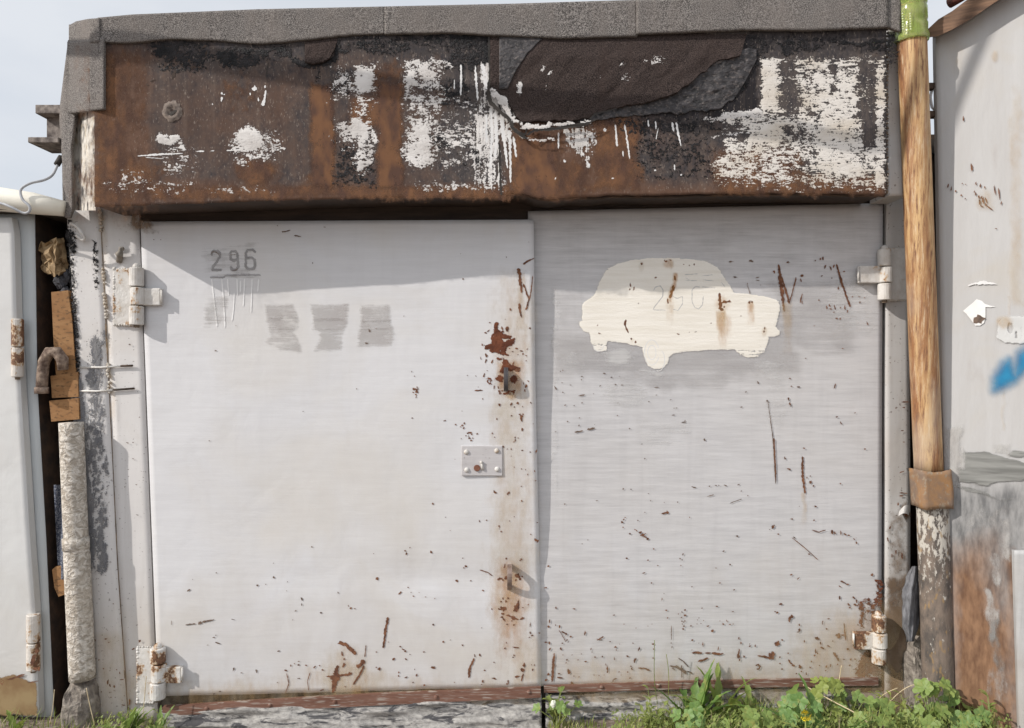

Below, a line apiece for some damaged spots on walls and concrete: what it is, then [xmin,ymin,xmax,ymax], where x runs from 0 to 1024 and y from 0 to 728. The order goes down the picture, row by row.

corrosion [79,52,643,207]
peeling [703,55,891,193]
corrosion [712,150,884,196]
corrosion [475,319,529,399]
peeling [963,299,995,326]
peeling [996,316,1024,344]
peeling [71,330,110,575]
corrosion [326,641,366,693]
corrosion [491,597,533,638]
corrosion [853,543,907,717]